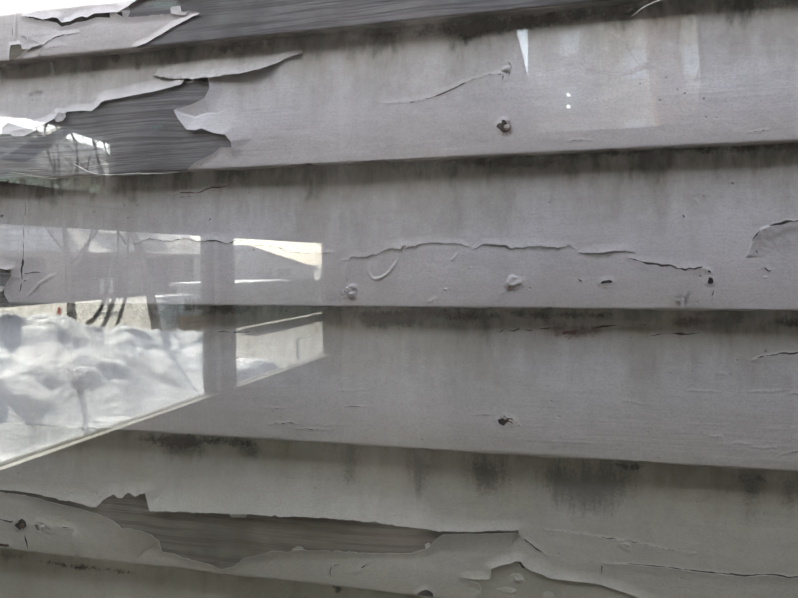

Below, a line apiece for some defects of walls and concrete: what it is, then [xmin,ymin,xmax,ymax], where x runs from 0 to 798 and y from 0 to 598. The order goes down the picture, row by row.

peeling [6,0,608,61]
peeling [0,45,305,303]
leakage [444,150,638,166]
leakage [731,143,798,152]
peeling [745,218,798,259]
crack [131,231,718,300]
leakage [69,305,248,321]
peeling [493,411,522,430]
leakage [139,435,251,448]
peeling [0,477,550,574]